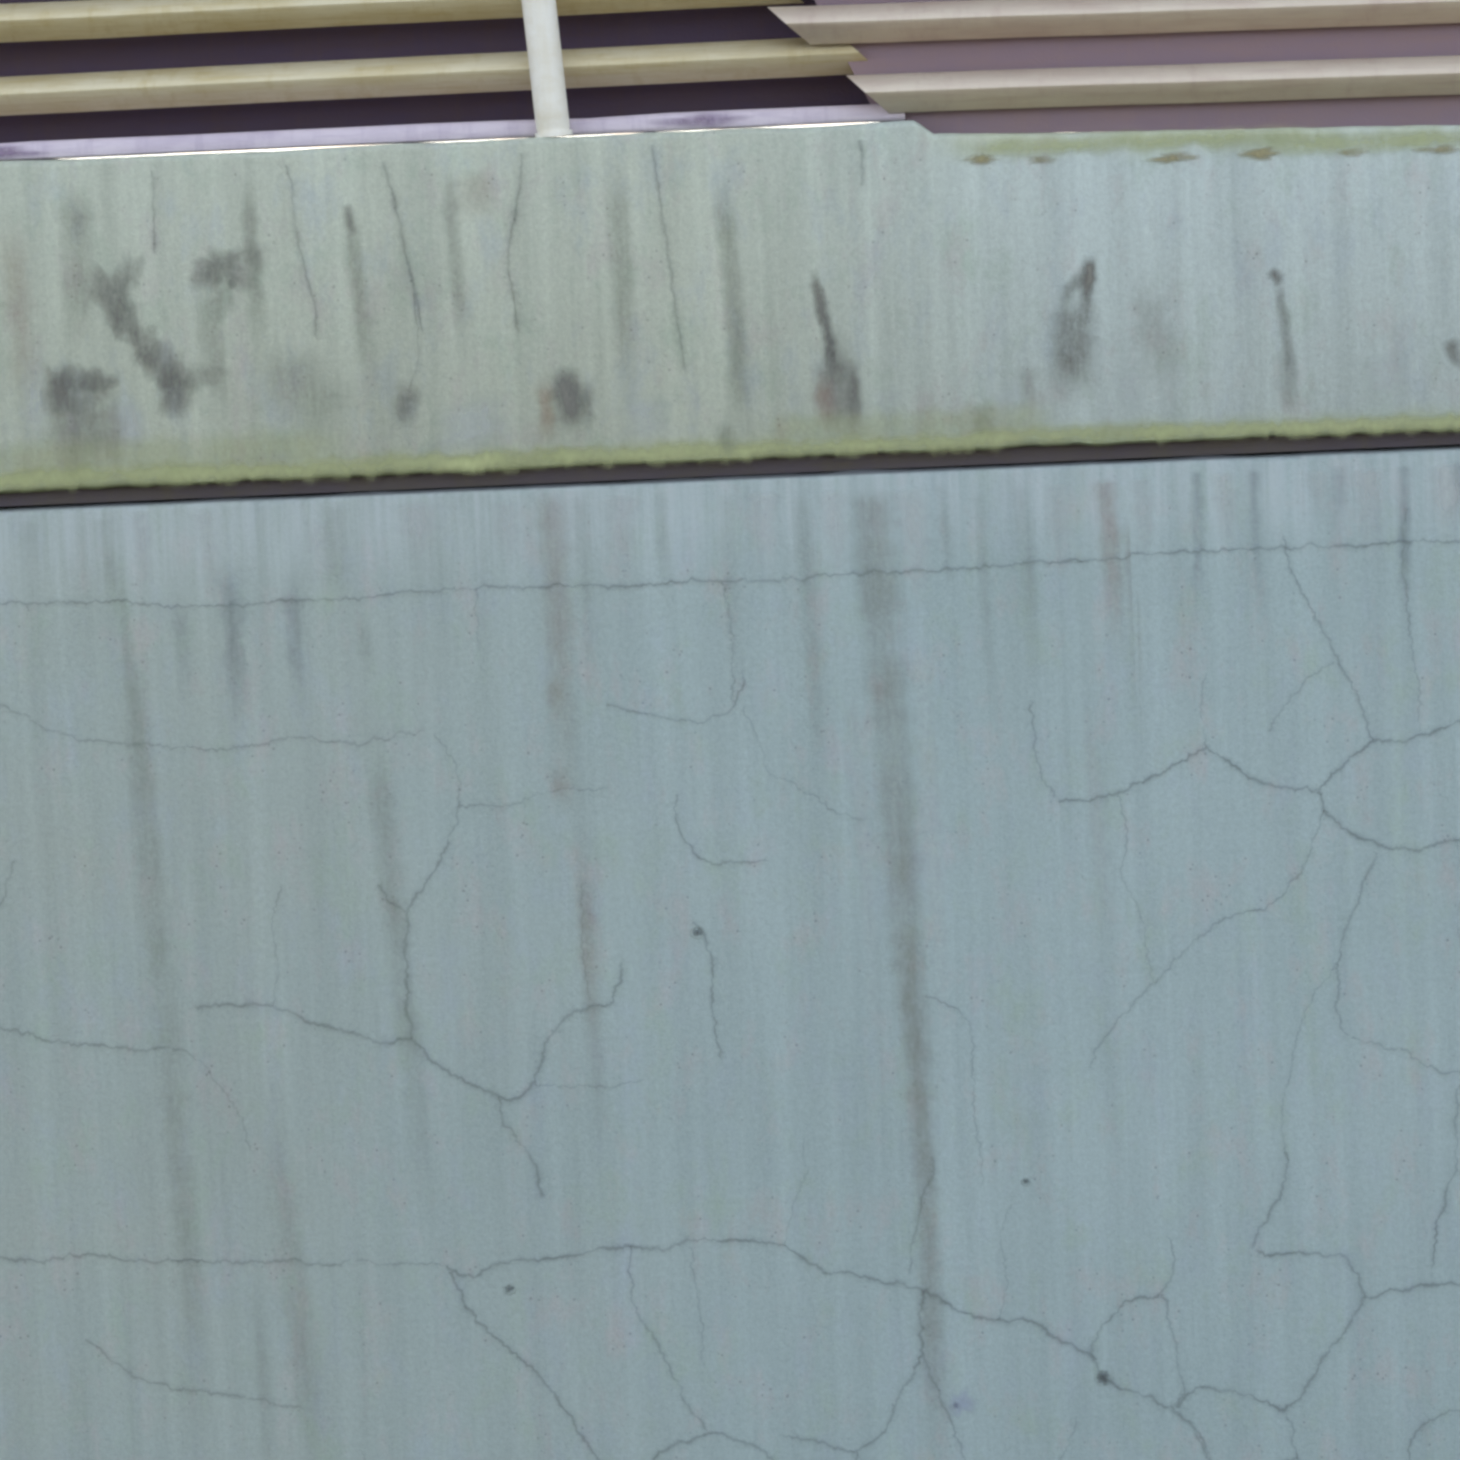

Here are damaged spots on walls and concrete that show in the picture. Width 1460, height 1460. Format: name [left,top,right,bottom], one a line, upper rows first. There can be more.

rust [972,155,991,163]
rust [1153,154,1192,162]
rust [1245,148,1276,159]
leakage [1082,263,1095,297]
leakage [815,283,835,359]